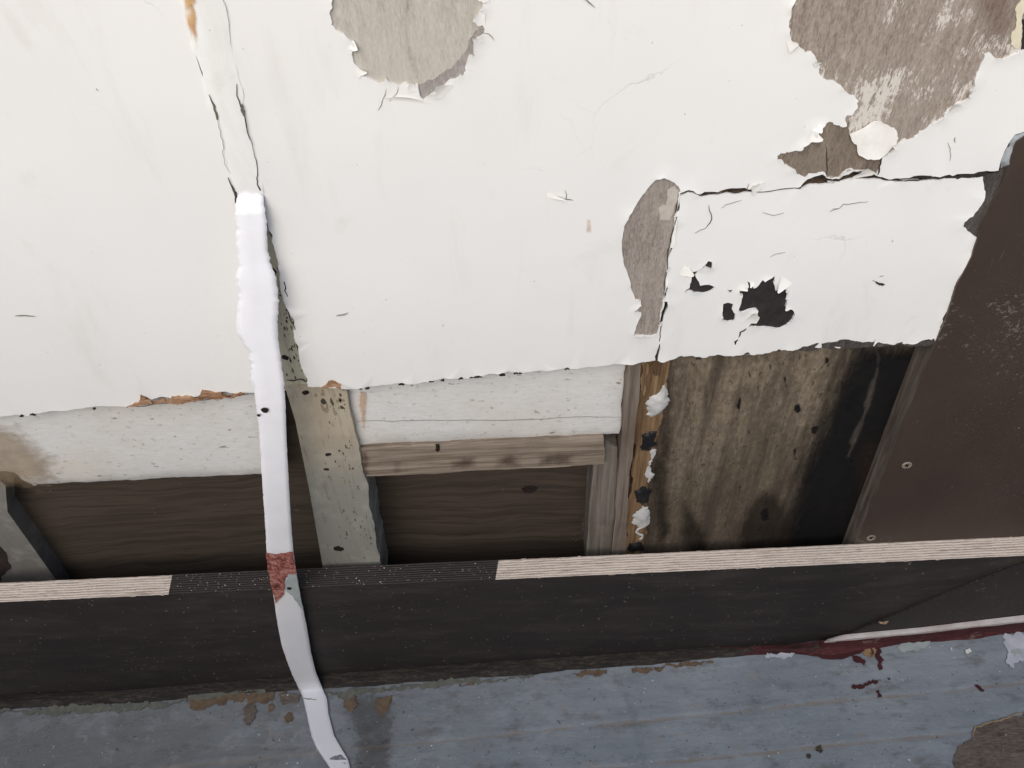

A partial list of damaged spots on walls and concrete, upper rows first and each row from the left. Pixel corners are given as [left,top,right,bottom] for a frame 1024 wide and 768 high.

peeling [330,0,489,99]
peeling [777,0,1024,180]
crack [209,84,298,349]
peeling [622,178,713,335]
peeling [722,276,794,345]
crack [656,139,987,359]
water stain [654,421,668,536]
water stain [684,514,704,551]
water stain [742,346,916,549]
peeling [953,713,1024,768]